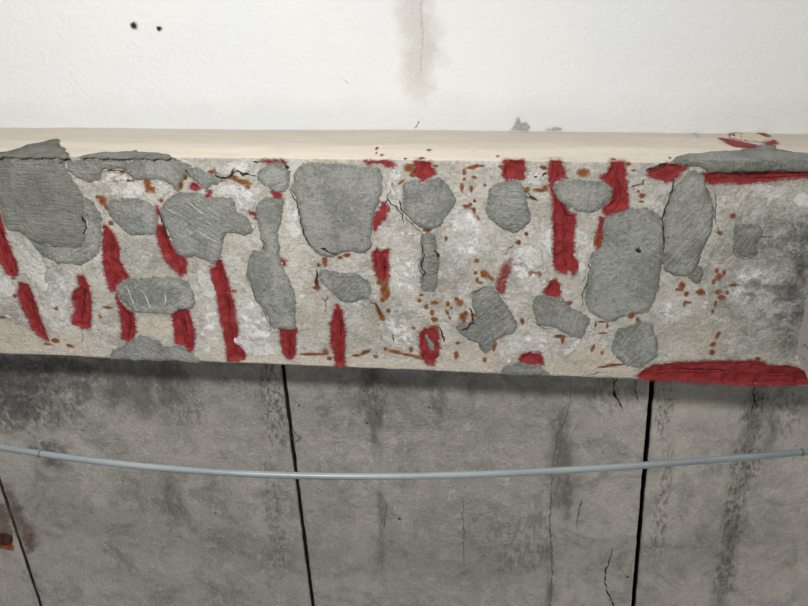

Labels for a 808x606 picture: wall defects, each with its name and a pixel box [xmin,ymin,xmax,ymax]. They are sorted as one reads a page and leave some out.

peeling [102,173,171,201]
peeling [213,161,255,211]
crack [208,161,262,179]
peeling [284,196,302,249]
peeling [0,272,16,299]
peeling [197,269,216,300]
corrosion [473,255,494,284]
corrosion [675,268,737,313]
damp [732,269,776,303]
corrosion [417,294,476,331]
peeling [234,315,276,357]
crack [549,372,638,606]